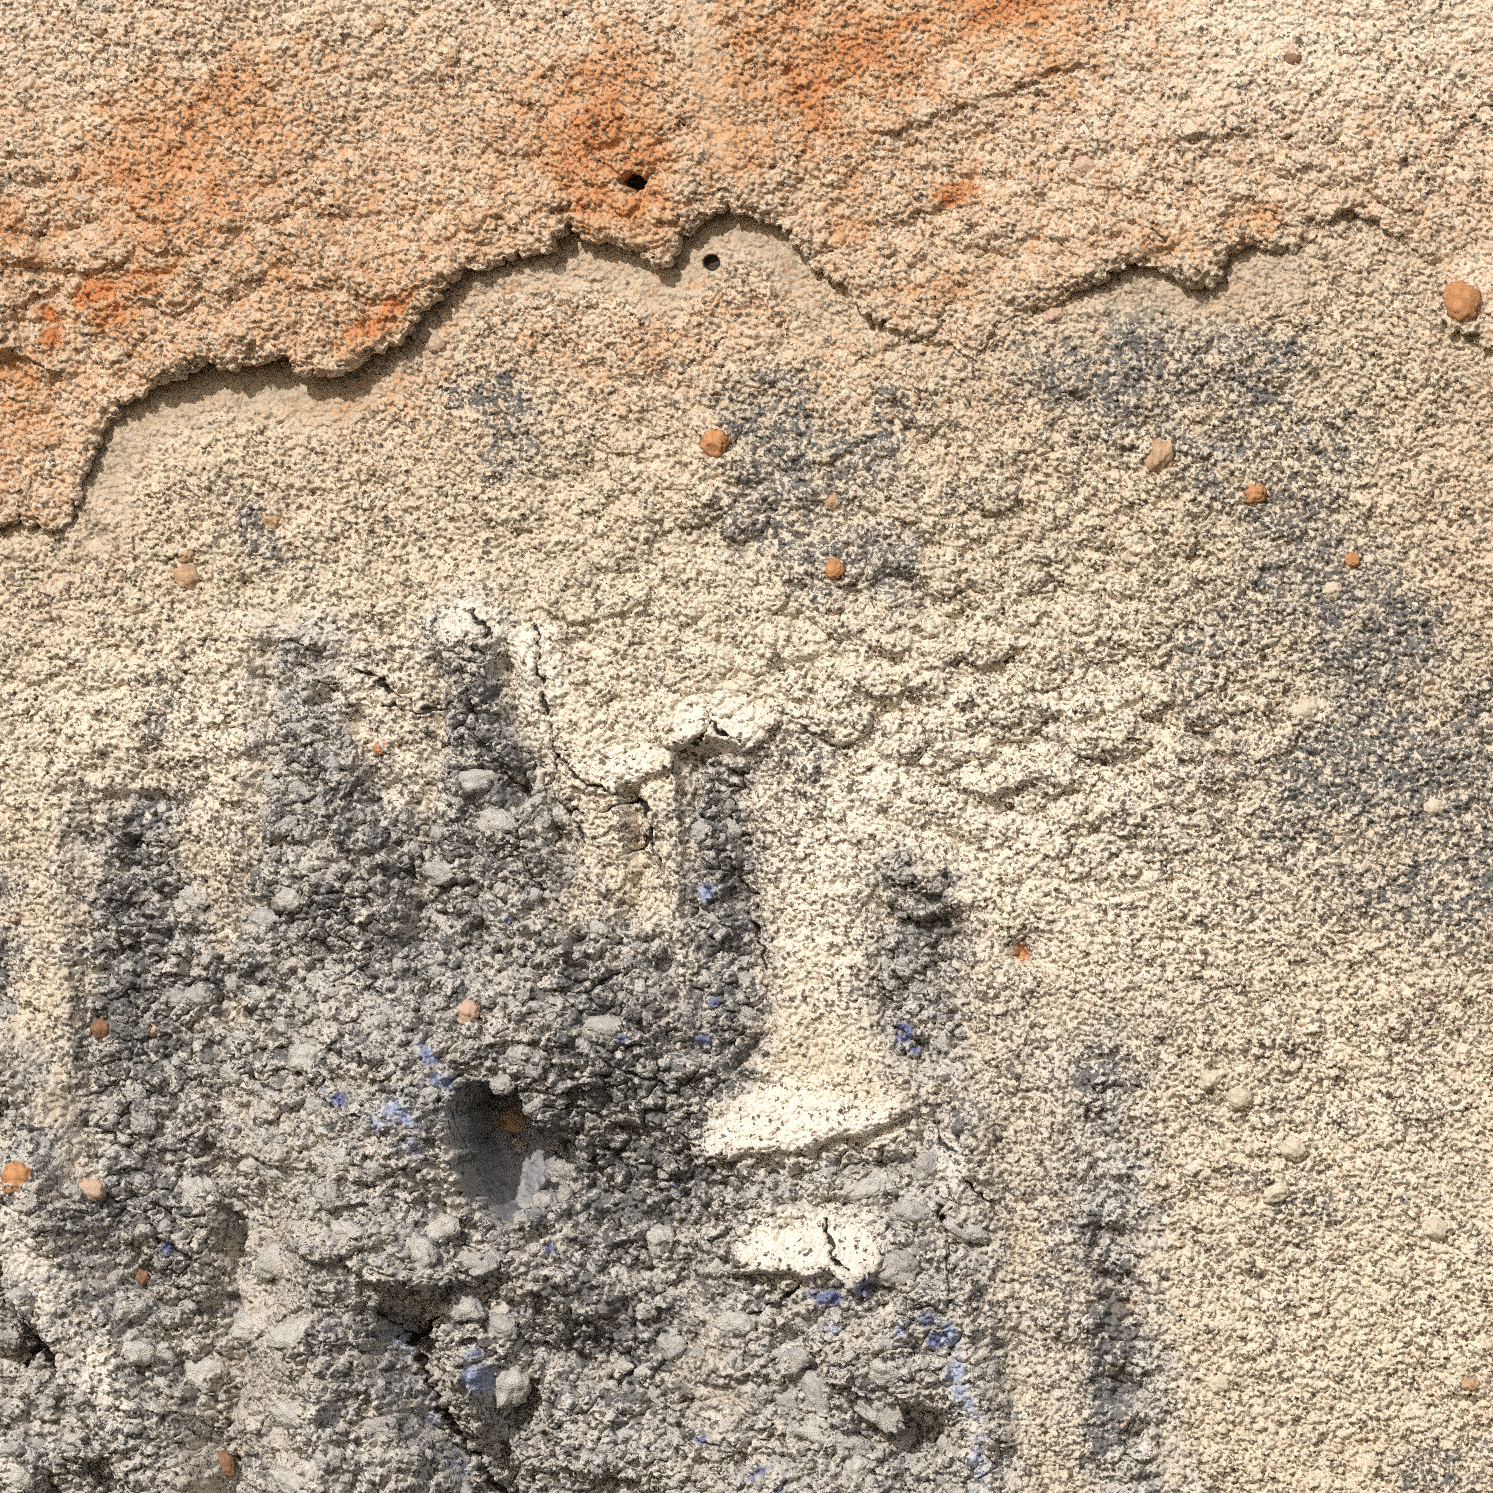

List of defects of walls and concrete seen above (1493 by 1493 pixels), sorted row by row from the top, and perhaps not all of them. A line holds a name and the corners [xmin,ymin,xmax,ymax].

corrosion [485,0,1211,263]
corrosion [0,17,350,524]
corrosion [302,285,458,430]
corrosion [502,285,822,396]
flaking render [0,0,1493,533]
corrosion [877,263,984,313]
crack [470,610,493,639]
crack [355,669,479,747]
crack [504,624,662,870]
crack [690,711,729,747]
crack [525,862,560,903]
spalling [0,622,1022,1493]